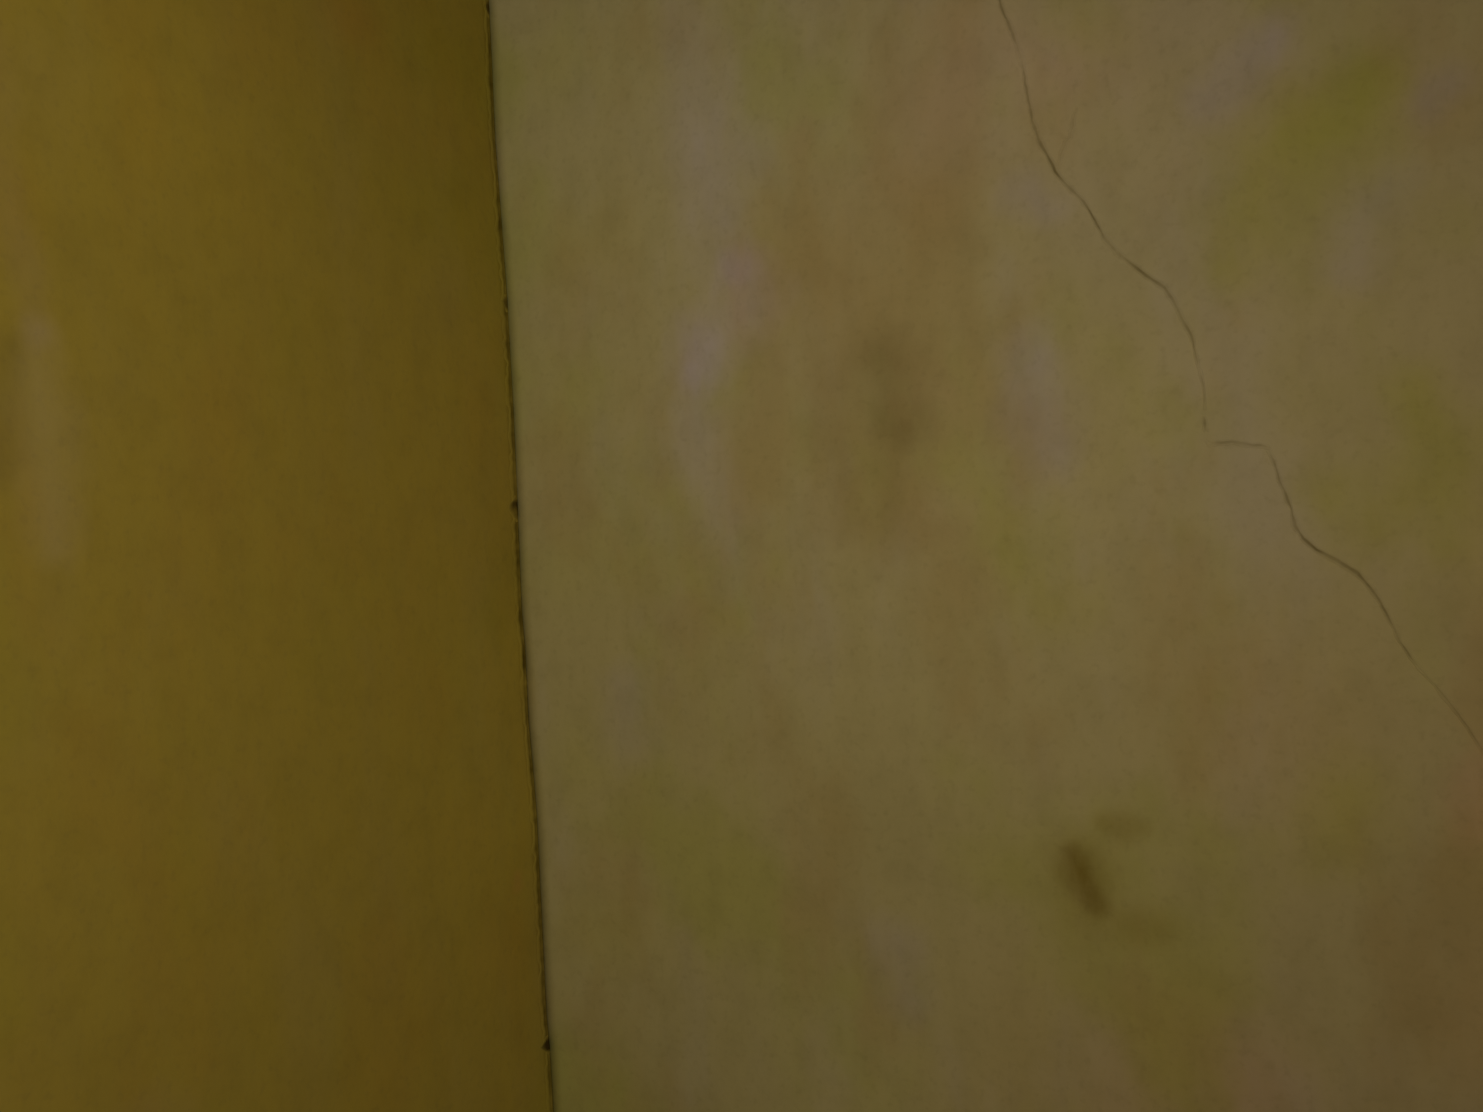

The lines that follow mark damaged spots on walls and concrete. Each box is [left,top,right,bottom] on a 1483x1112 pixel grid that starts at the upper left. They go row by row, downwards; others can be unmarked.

crack [997,0,1483,755]